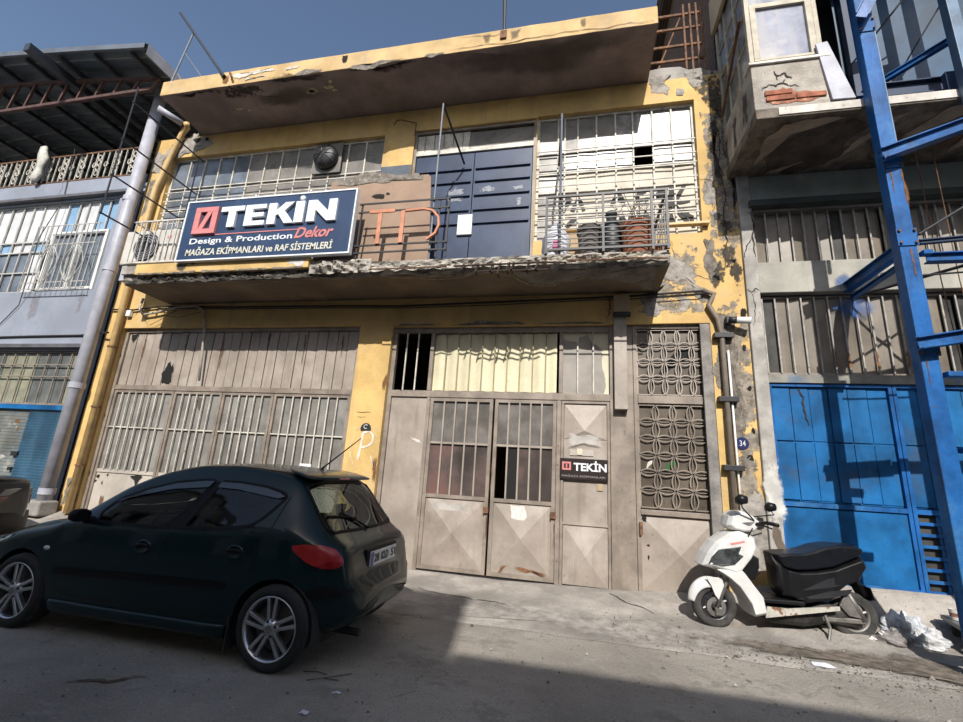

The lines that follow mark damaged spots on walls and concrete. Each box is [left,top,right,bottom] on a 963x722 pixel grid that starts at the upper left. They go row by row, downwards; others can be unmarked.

peeling [233,66,322,80]
spalling [351,58,403,70]
spalling [649,70,704,95]
crack [762,71,798,90]
flaking render [765,87,827,104]
peeling [124,112,741,311]
peeling [712,295,787,575]